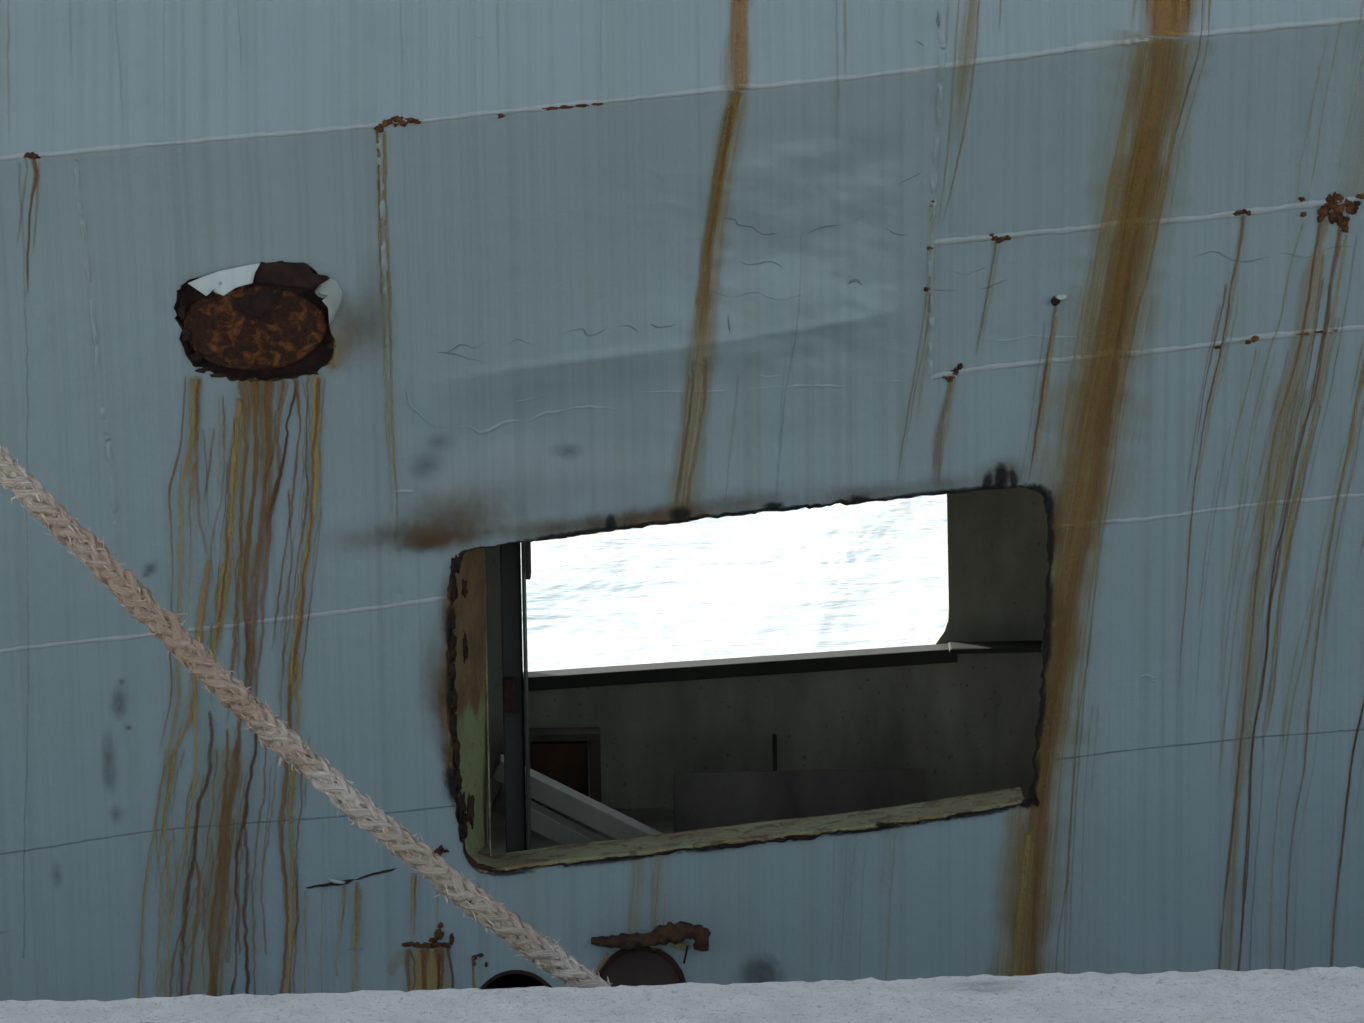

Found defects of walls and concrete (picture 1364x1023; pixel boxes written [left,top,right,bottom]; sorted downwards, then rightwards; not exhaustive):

rust [168,374,324,745]
rust [374,116,421,483]
rust [675,0,747,523]
rust [979,233,1011,336]
rust [1008,0,1203,977]
rust [1183,209,1252,625]
rust [1219,192,1364,971]
rust [138,651,307,998]
rust [321,884,360,993]
rust [401,875,454,991]
rust [472,953,488,988]